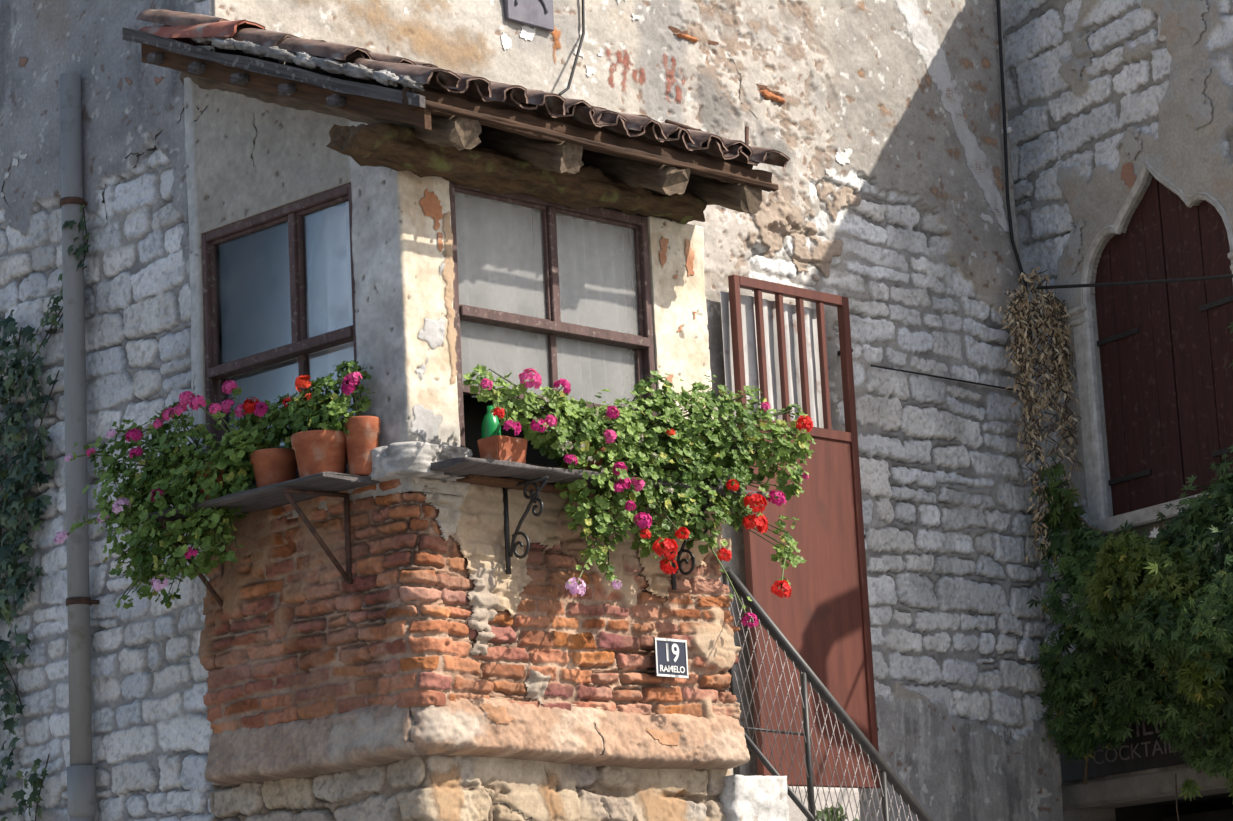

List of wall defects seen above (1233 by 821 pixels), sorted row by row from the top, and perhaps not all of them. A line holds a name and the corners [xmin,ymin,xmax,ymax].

flaking render [669,0,813,71]
crack [125,106,207,168]
flaking render [717,83,814,134]
spalling [1121,163,1137,189]
flaking render [748,147,862,281]
flaking render [416,188,458,384]
spalling [410,404,442,442]
flaking render [412,477,568,656]
flaking render [615,506,717,605]
flaking render [524,669,551,705]